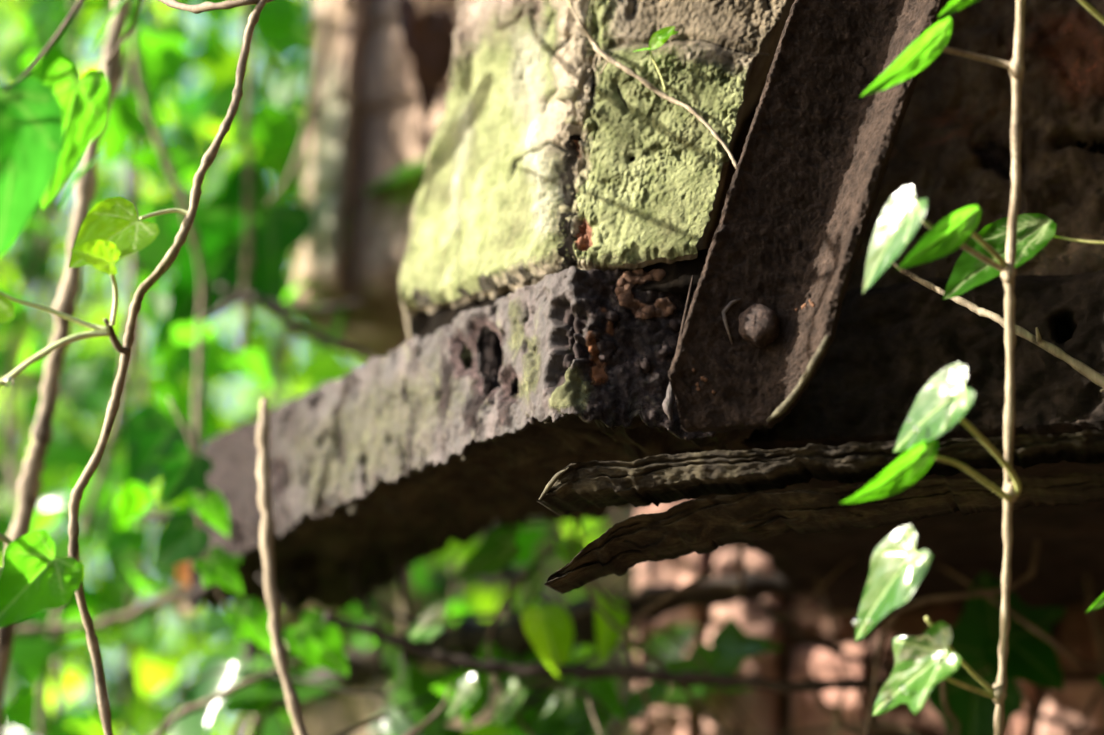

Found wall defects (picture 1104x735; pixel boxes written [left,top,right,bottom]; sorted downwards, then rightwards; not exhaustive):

damp [587,0,614,55]
damp [630,0,786,71]
damp [452,0,560,237]
damp [434,100,472,303]
peeling [411,287,435,307]
peeling [456,261,535,297]
spalling [479,331,519,396]
corrosion [586,333,608,385]
peeling [662,312,684,356]